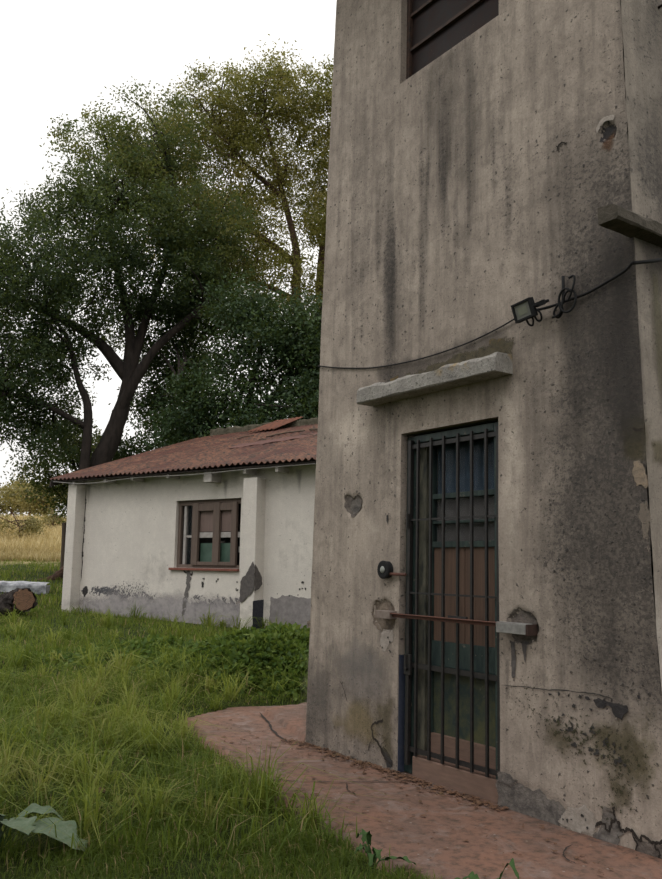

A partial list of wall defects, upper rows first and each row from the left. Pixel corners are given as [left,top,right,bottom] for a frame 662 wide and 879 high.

spalling [344,494,362,517]
peeling [81,585,156,600]
peeling [191,562,311,629]
crack [368,719,392,768]
peeling [495,607,661,845]